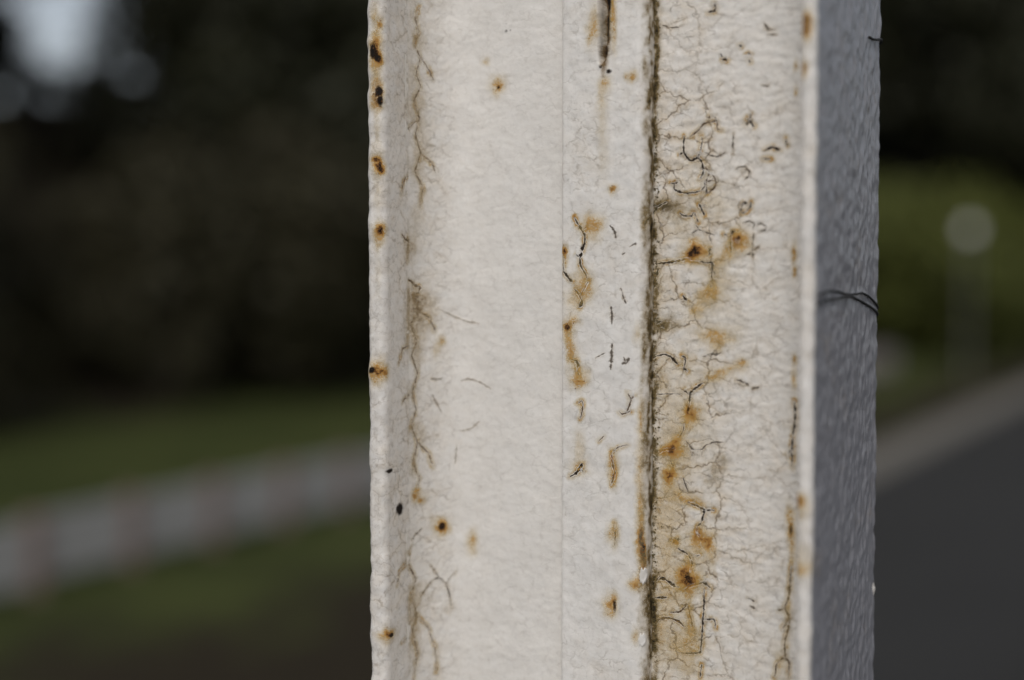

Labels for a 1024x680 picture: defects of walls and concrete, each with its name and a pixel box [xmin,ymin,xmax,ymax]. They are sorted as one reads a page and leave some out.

rust [370,20,384,109]
crack [401,5,437,208]
rust [588,0,615,85]
rust [683,238,708,263]
crack [398,278,491,489]
rust [563,318,586,389]
crack [562,114,793,679]
rust [658,404,702,506]
crack [788,397,798,467]
rust [435,519,448,534]
crack [396,527,457,678]
rust [675,562,700,636]